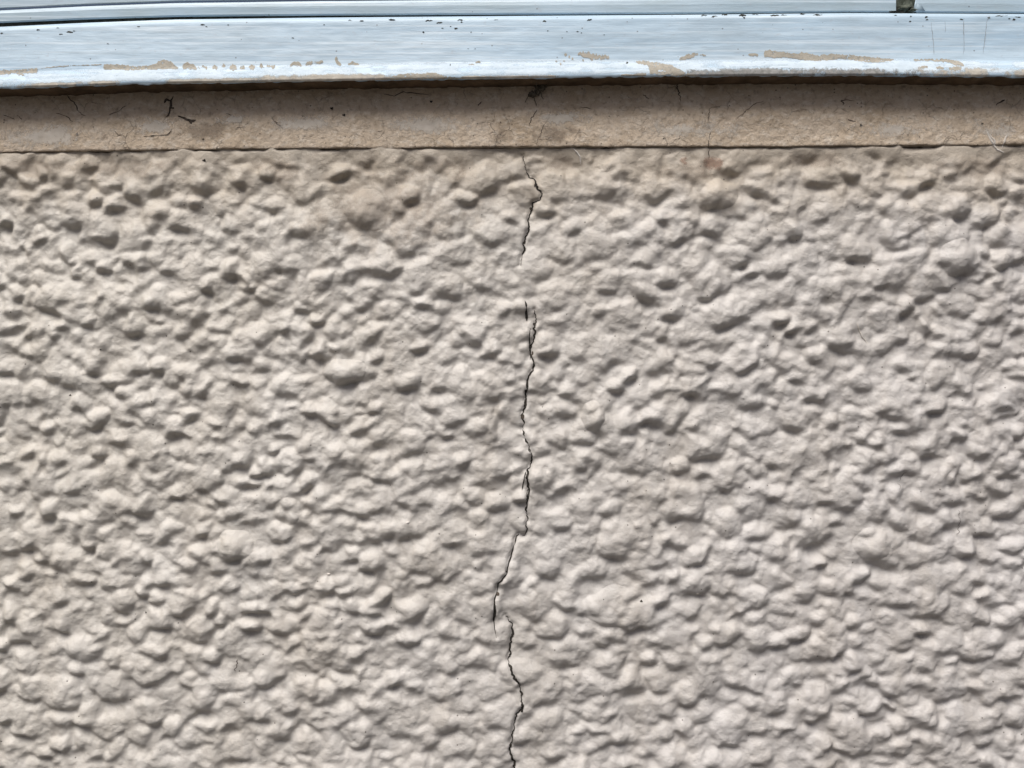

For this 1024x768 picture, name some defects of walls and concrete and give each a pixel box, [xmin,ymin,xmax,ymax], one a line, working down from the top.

peeling [0,59,275,76]
peeling [290,57,359,67]
peeling [555,51,609,65]
peeling [621,53,706,77]
peeling [748,49,894,63]
peeling [914,58,964,71]
peeling [381,72,464,80]
crack [493,301,537,768]